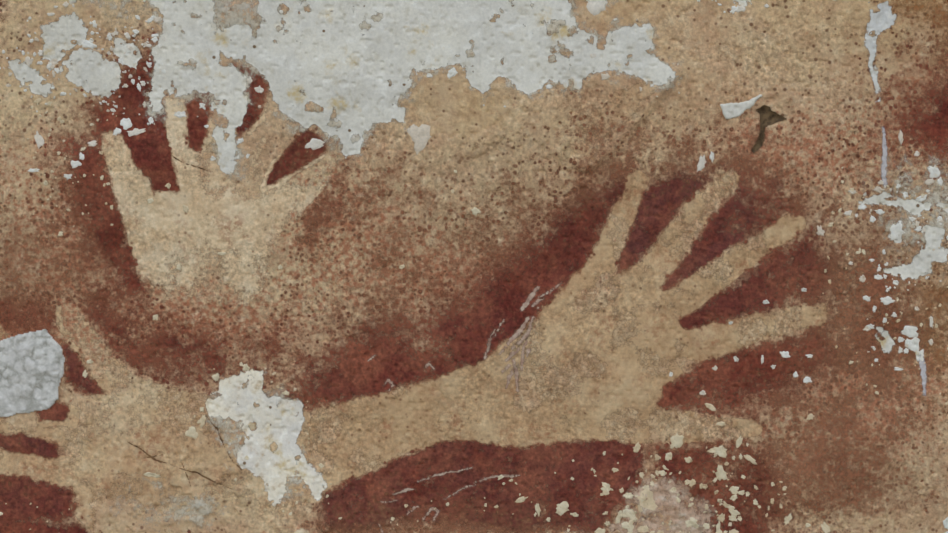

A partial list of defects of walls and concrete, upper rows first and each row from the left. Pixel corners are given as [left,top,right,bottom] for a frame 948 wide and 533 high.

spalling [0,0,679,215]
spalling [720,95,787,153]
spalling [185,362,332,518]